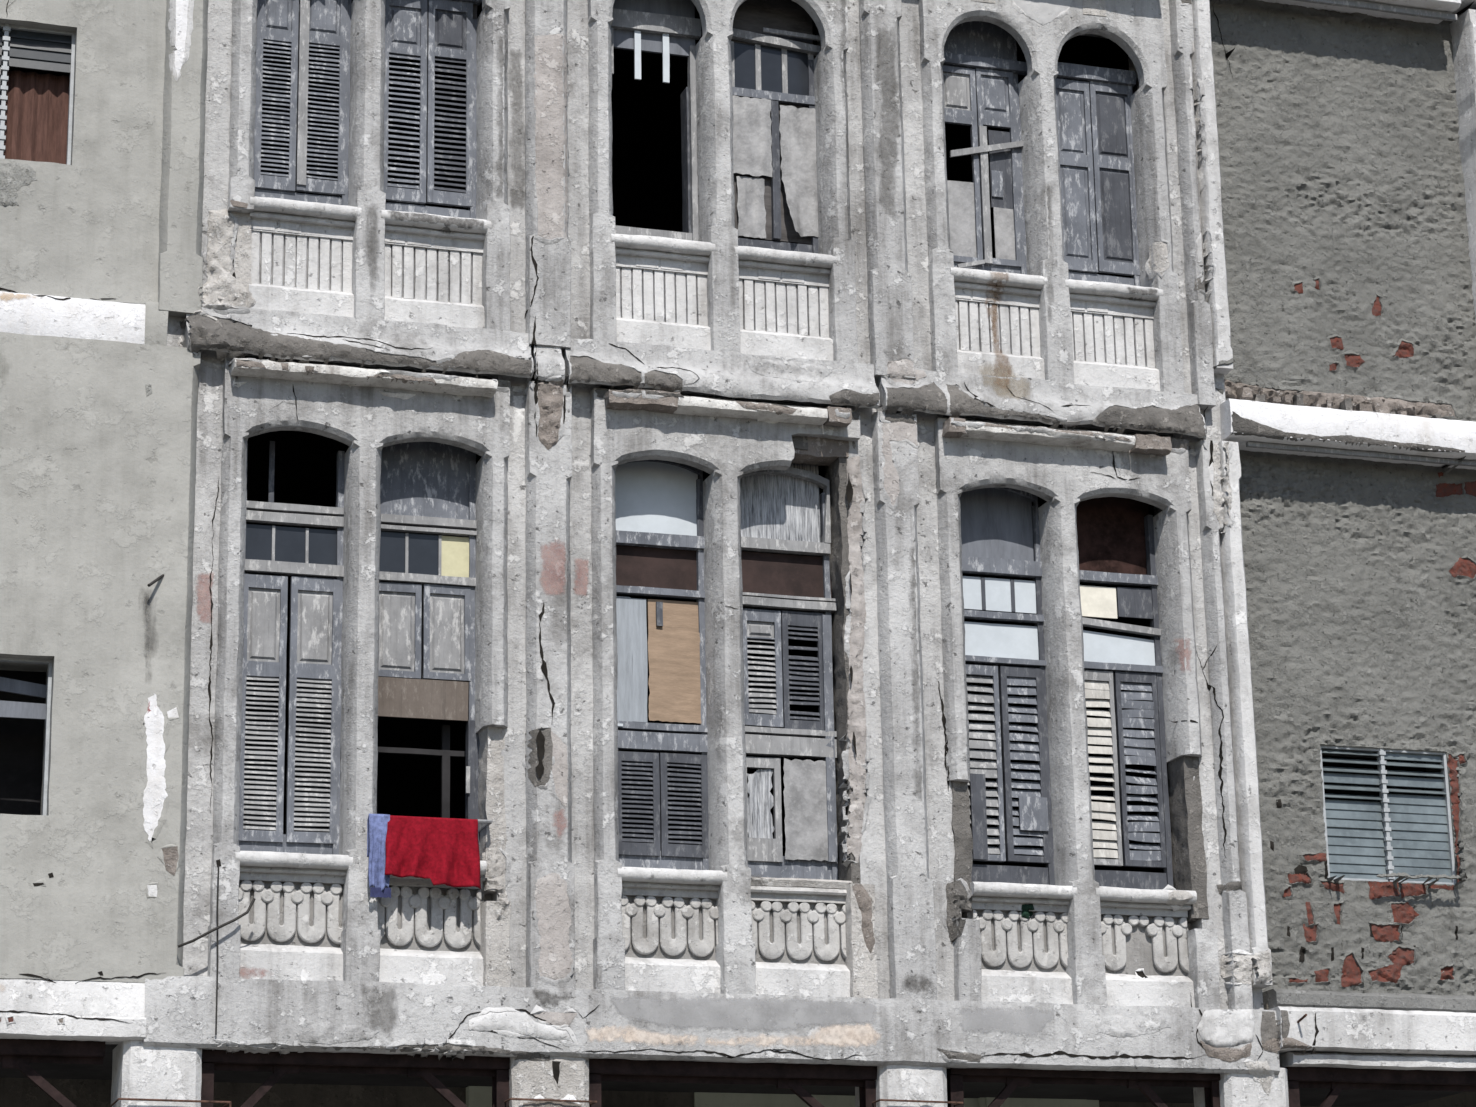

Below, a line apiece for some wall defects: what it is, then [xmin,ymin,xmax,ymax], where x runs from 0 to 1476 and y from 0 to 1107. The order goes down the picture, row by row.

spalling [0,163,38,207]
spalling [177,200,686,450]
spalling [1290,276,1323,294]
spalling [1326,334,1365,374]
spalling [1370,293,1384,316]
spalling [1388,339,1414,362]
spalling [736,401,797,424]
crack [536,603,555,778]
spalling [746,354,1476,989]
peeling [140,694,181,898]
spalling [212,1005,880,1107]
spalling [1200,1010,1320,1096]